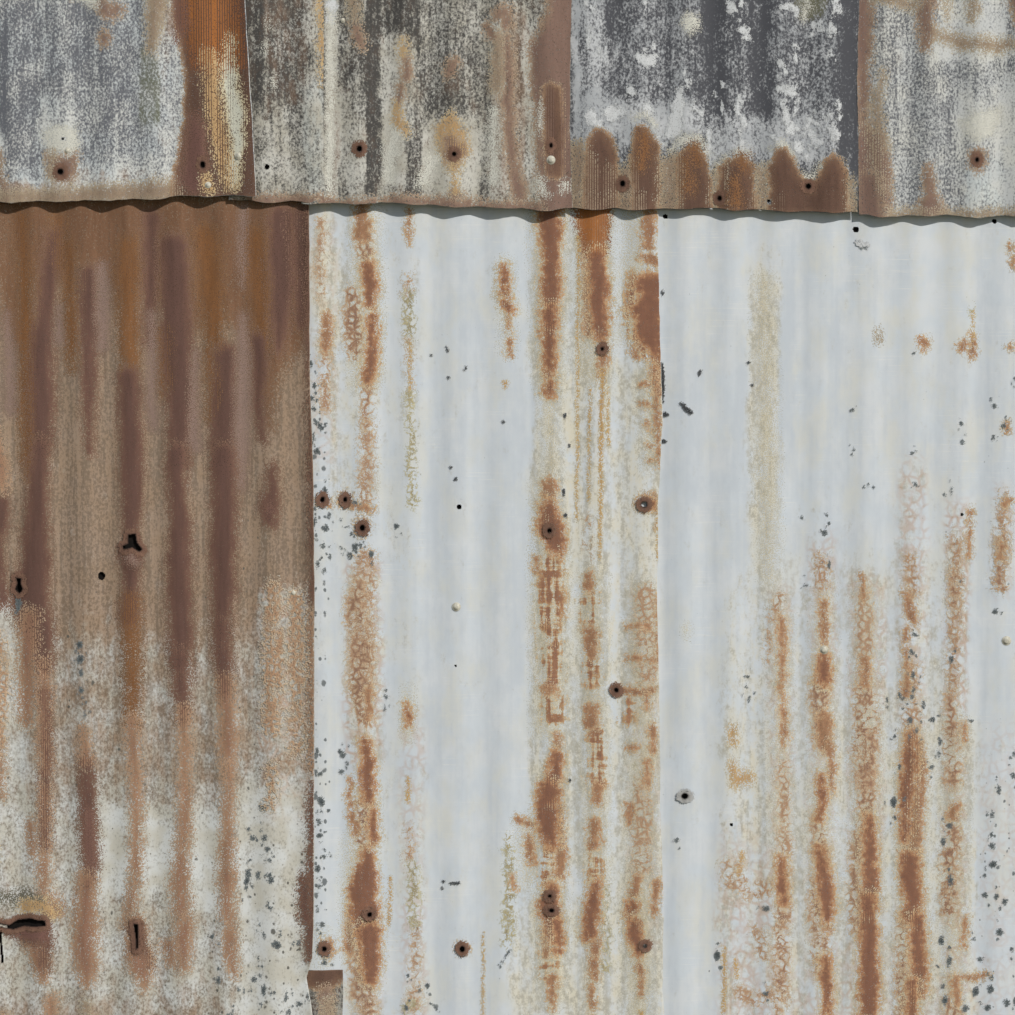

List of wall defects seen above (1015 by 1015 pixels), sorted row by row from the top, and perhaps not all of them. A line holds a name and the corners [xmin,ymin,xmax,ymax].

rust [397,270,422,514]
rust [489,253,523,362]
rust [914,333,933,356]
rust [953,301,982,364]
rust [1004,238,1015,273]
rust [253,455,287,535]
rust [631,488,658,561]
rust [987,487,1015,597]
rust [396,684,419,744]
rust [572,560,664,1015]
rust [718,503,994,1015]
rust [399,822,429,1015]